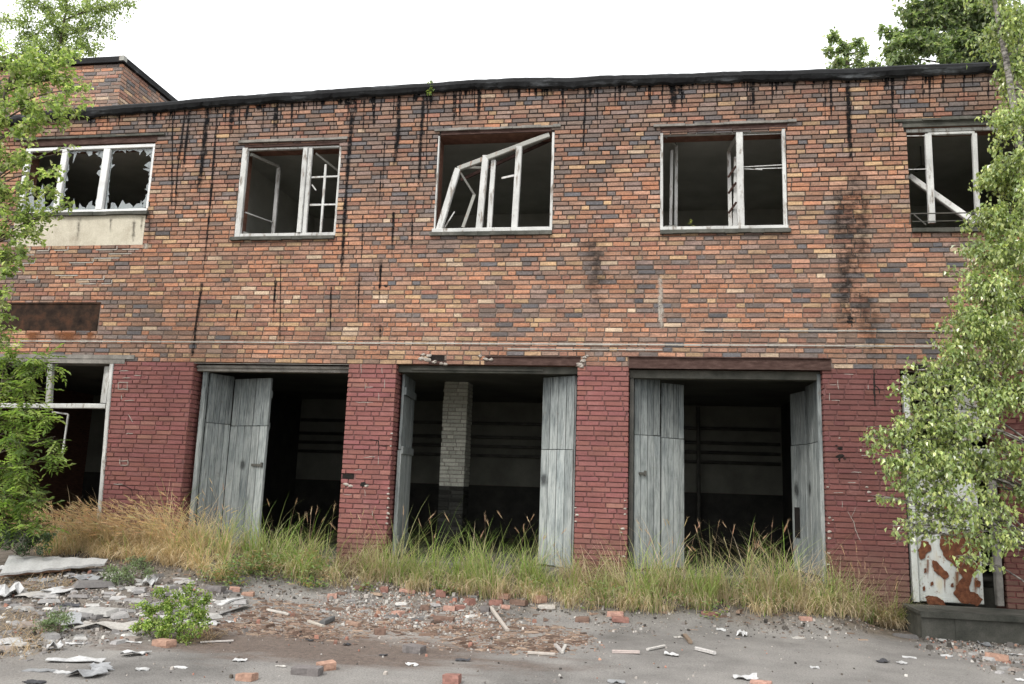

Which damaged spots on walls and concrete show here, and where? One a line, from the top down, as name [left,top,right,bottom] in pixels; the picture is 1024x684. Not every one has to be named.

leakage [508,88,564,116]
leakage [577,87,598,154]
leakage [638,83,718,107]
leakage [731,81,798,109]
leakage [846,80,856,157]
leakage [869,77,905,152]
leakage [922,76,944,107]
leakage [146,110,191,205]
leakage [197,89,493,275]
leakage [191,283,203,355]
leakage [273,255,281,327]
rust [918,518,984,606]